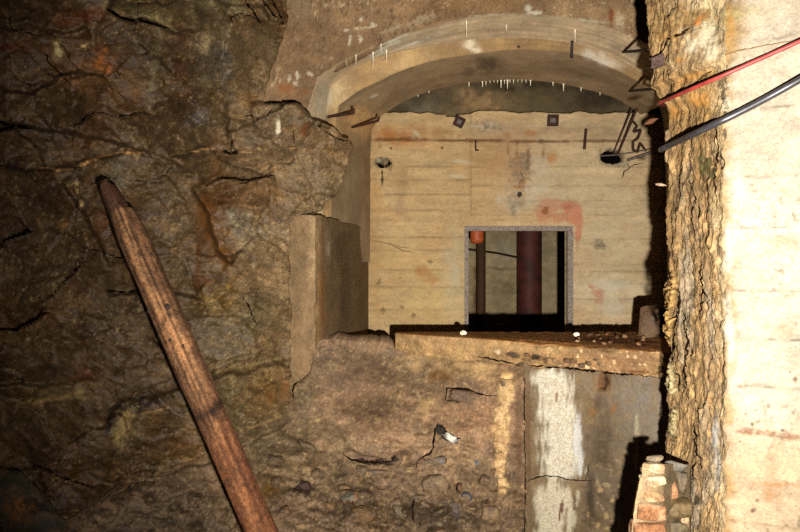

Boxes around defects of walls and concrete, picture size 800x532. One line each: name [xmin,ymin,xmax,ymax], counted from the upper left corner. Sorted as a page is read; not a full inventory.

crack [343,453,393,464]
crack [416,423,461,467]
crack [478,356,652,532]